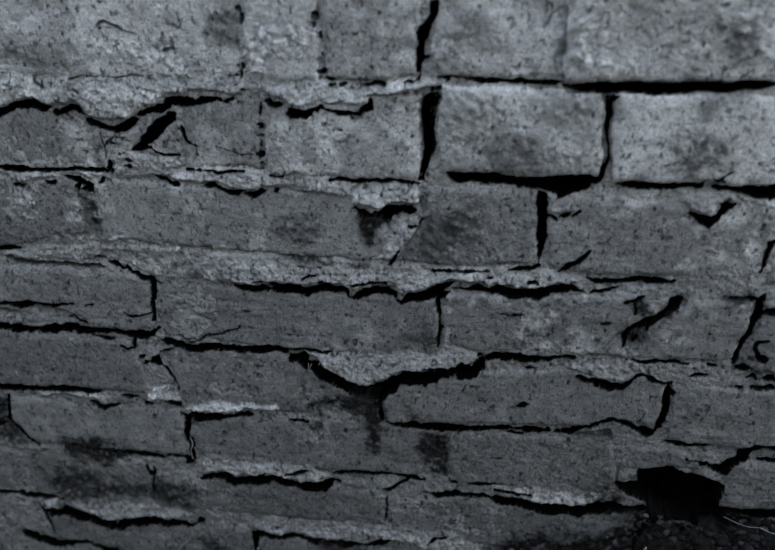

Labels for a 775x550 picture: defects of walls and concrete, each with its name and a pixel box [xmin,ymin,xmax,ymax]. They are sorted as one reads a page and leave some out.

crack [264,98,374,120]
crack [0,78,254,184]
crack [204,182,280,198]
crack [677,172,737,229]
crack [5,254,107,268]
crack [759,240,775,273]
crack [0,299,94,324]
crack [734,340,775,391]
crack [553,417,657,437]
spalling [617,466,637,481]
crack [200,470,643,517]
crack [39,503,206,535]